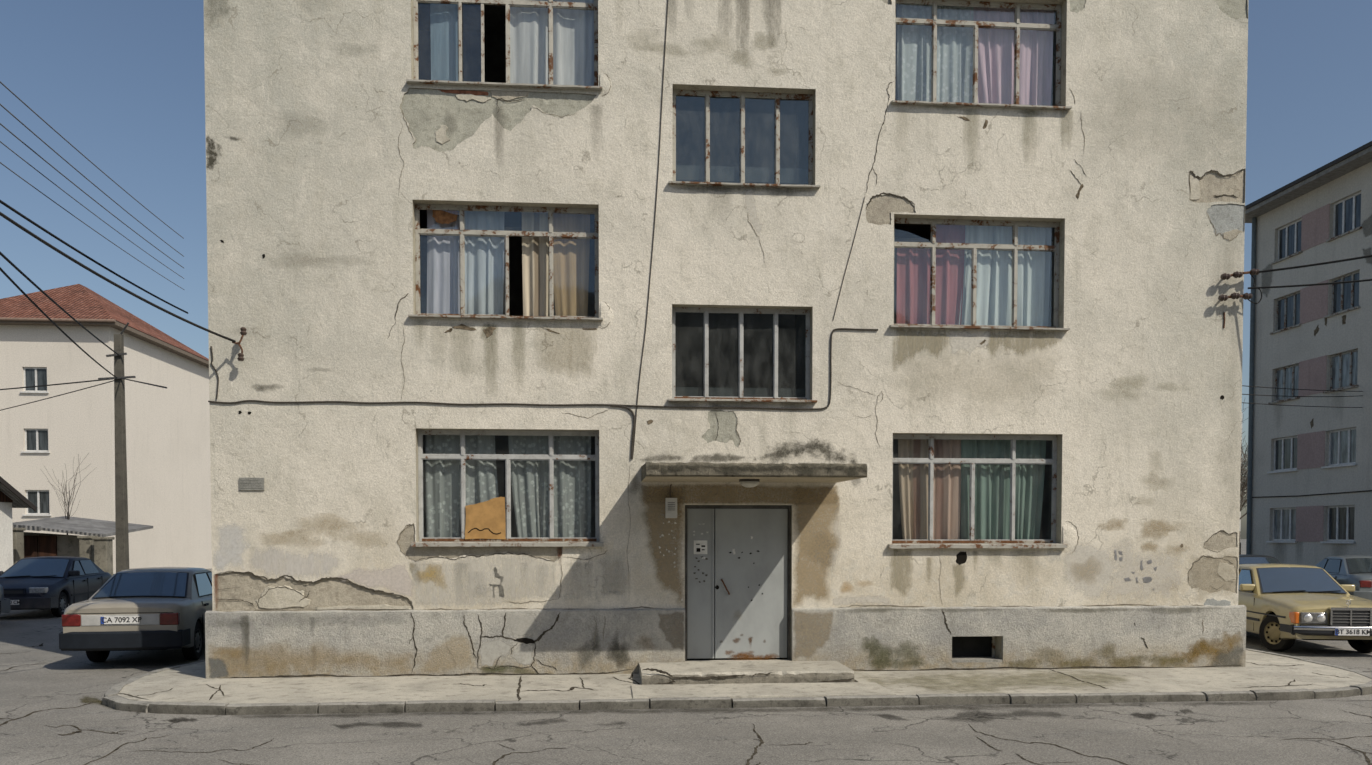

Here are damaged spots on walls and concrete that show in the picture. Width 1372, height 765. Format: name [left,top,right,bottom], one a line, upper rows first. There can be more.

flaking render [1214,0,1248,20]
flaking render [400,88,596,152]
crack [866,81,894,192]
peeling [866,192,916,225]
flaking render [1188,169,1245,241]
peeling [702,410,741,447]
mould [649,442,865,477]
peeling [1187,530,1238,593]
flaking render [214,571,414,611]
crack [206,468,770,696]
leakage [1214,648,1243,667]